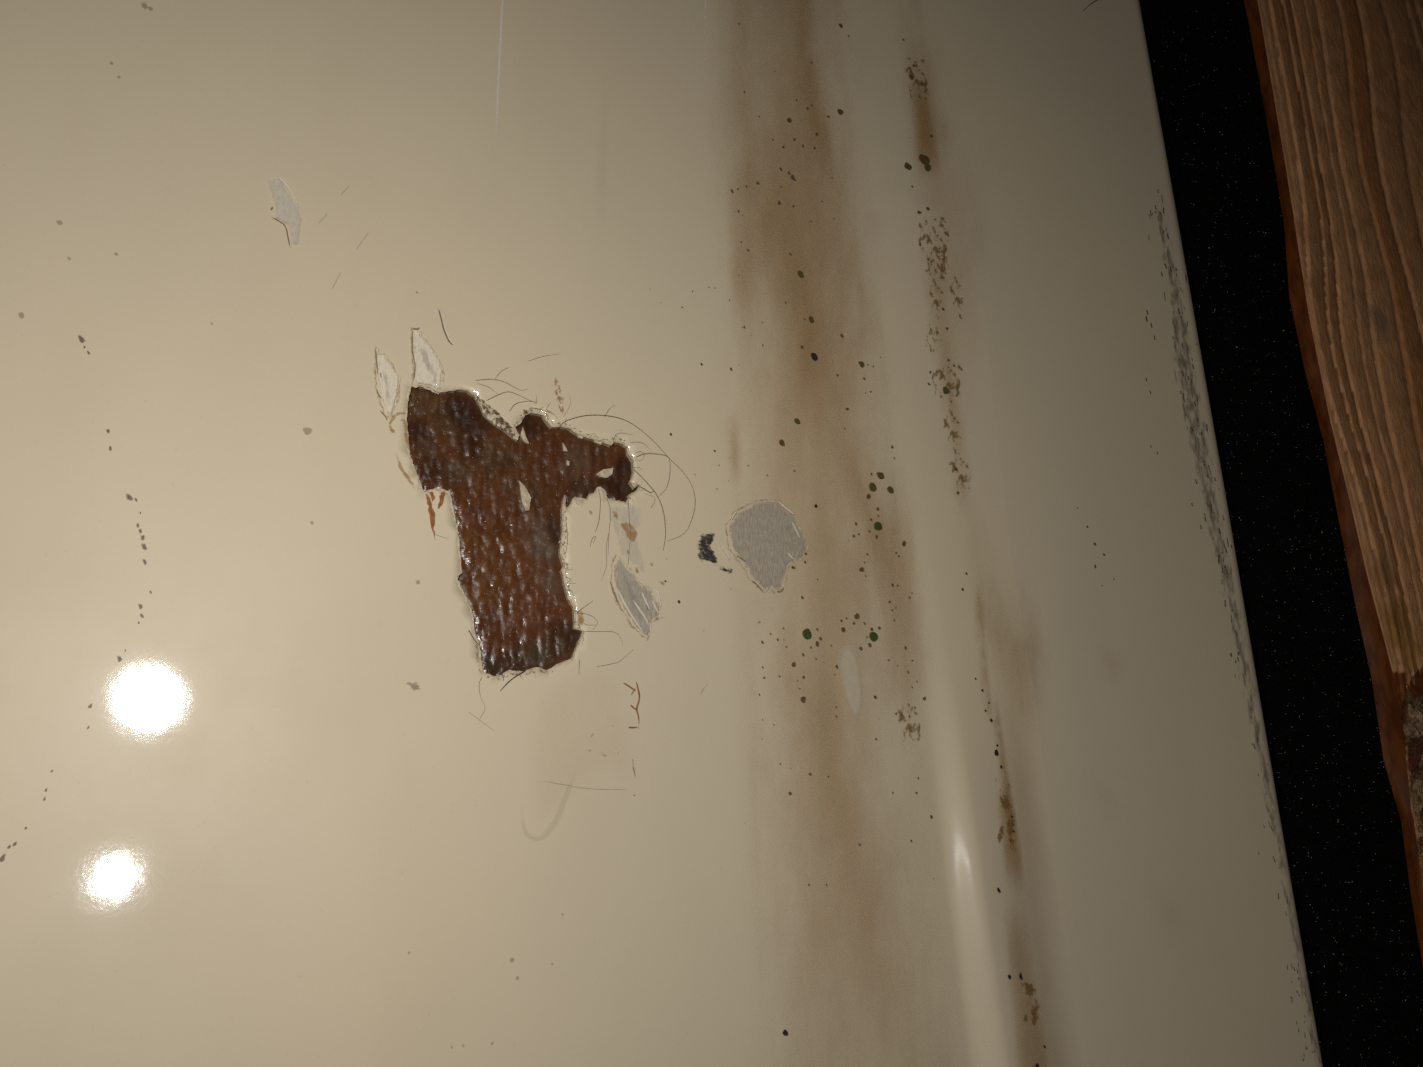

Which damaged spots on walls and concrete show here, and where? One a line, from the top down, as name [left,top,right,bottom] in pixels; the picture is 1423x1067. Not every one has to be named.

water stain [904,154,931,187]
peeling [373,327,446,419]
water stain [917,207,970,494]
corrosion [426,492,445,535]
peeling [518,481,531,511]
peeling [596,468,628,502]
peeling [721,499,808,594]
water stain [852,472,894,538]
peeling [610,555,661,642]
water stain [840,583,912,650]
water stain [759,621,832,703]
water stain [995,744,1016,850]